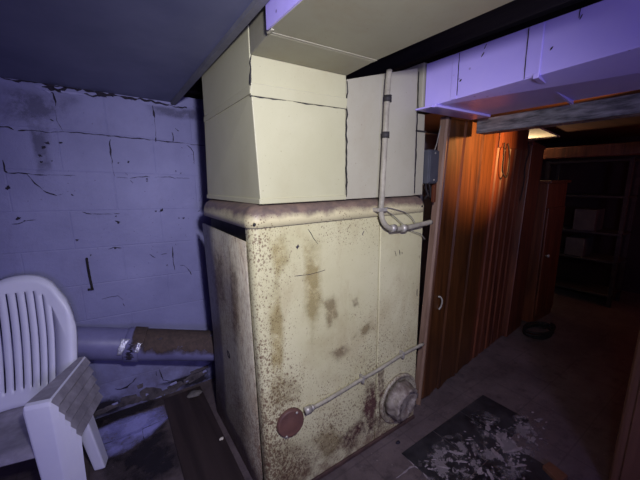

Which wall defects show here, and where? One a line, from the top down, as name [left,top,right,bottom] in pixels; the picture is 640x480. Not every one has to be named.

crack [0,77,205,183]
crack [2,160,74,196]
spalling [93,365,208,418]